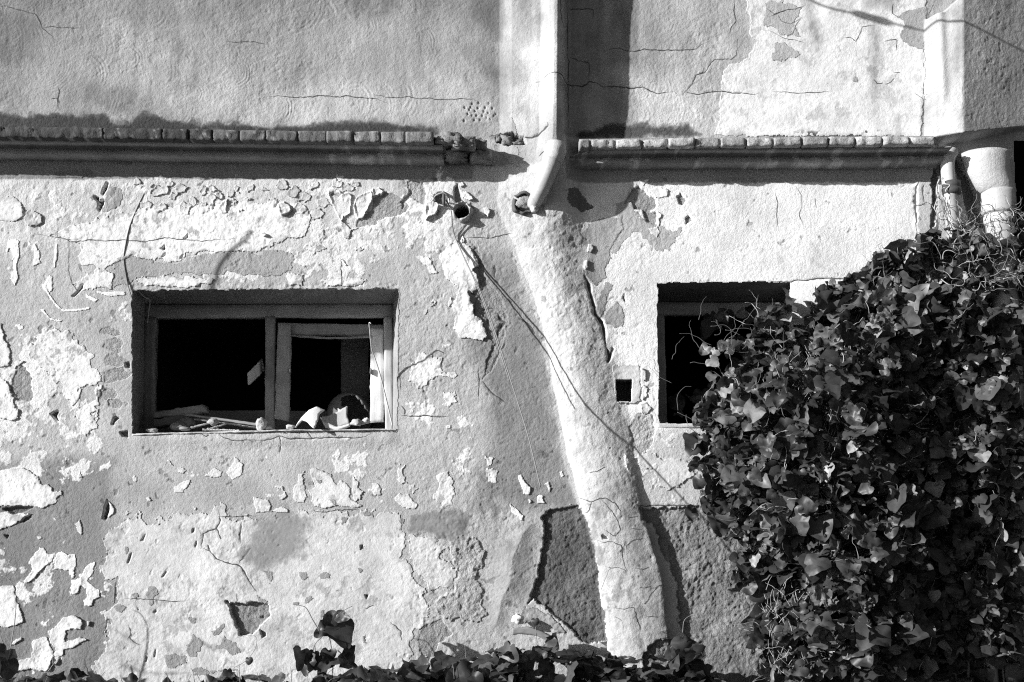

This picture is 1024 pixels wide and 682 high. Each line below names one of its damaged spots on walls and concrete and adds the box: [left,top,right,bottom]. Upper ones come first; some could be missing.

crack [7,6,81,35]
crack [273,94,479,102]
crack [525,0,829,159]
peeling [715,0,938,137]
crack [845,5,898,84]
peeling [0,177,490,297]
peeling [417,236,508,374]
peeling [567,179,692,327]
peeling [0,323,130,437]
peeling [408,352,457,389]
peeling [485,456,498,483]
peeling [0,465,487,682]